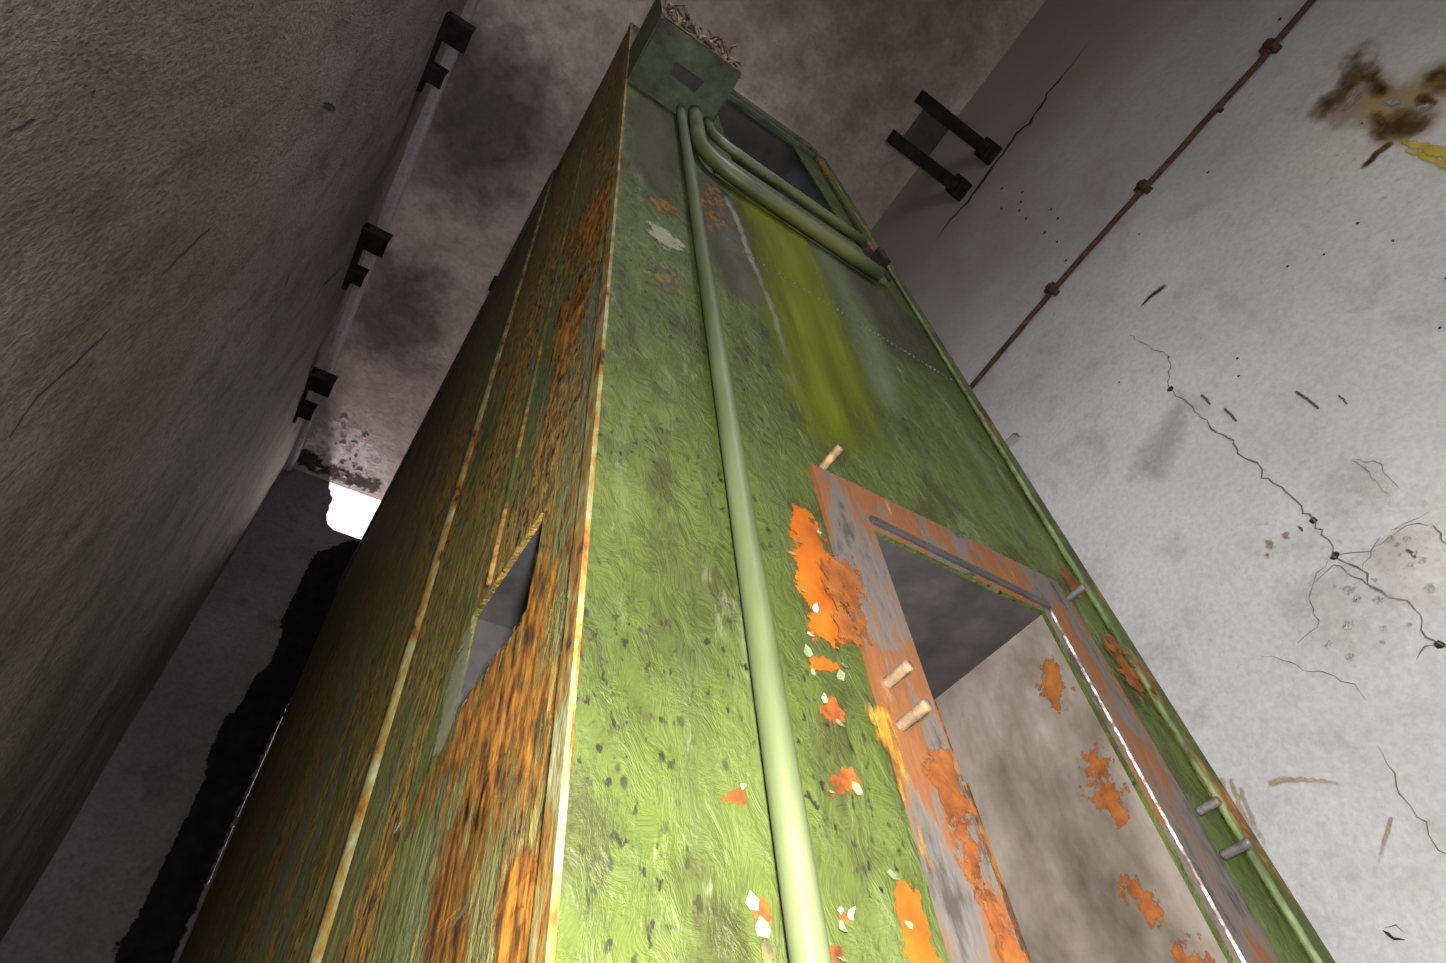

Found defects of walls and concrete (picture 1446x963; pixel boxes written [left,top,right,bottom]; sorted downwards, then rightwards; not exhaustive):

corrosion [1319,55,1446,170]
crack [1130,335,1446,697]
crack [1379,748,1446,854]